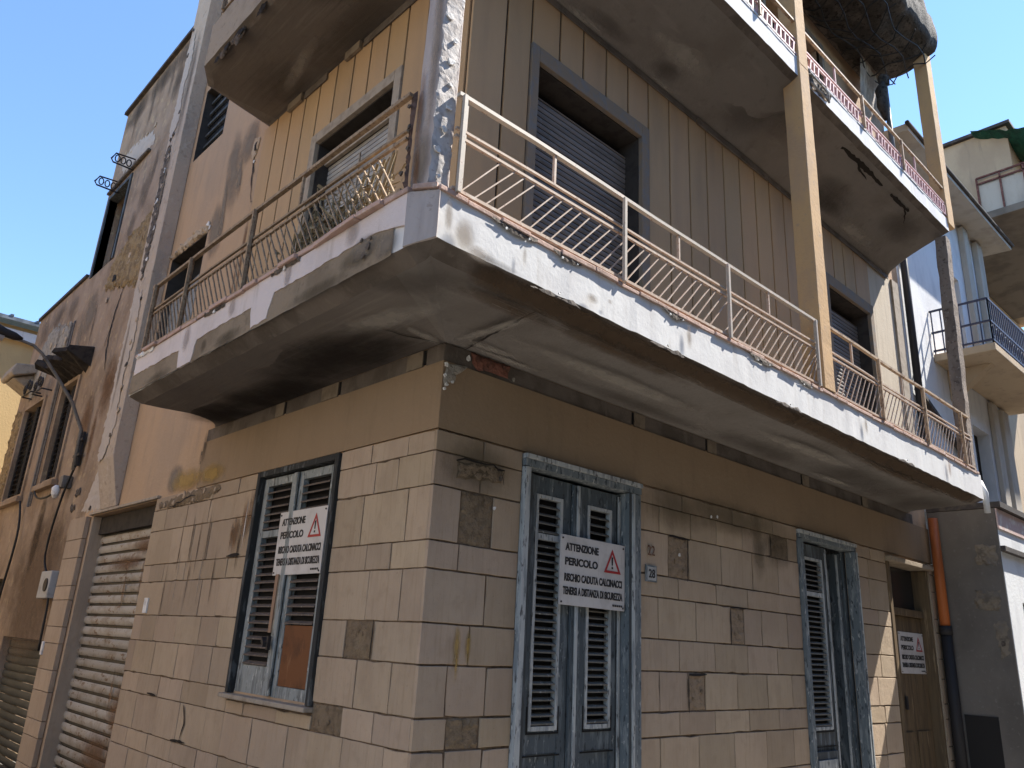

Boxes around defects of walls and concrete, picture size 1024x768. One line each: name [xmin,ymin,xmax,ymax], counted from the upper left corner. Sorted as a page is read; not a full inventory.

spalling [427,0,465,187]
damp [209,127,256,252]
crack [840,146,909,223]
peeling [70,28,196,514]
spalling [271,256,300,277]
crack [104,287,124,368]
flaking render [443,353,515,390]